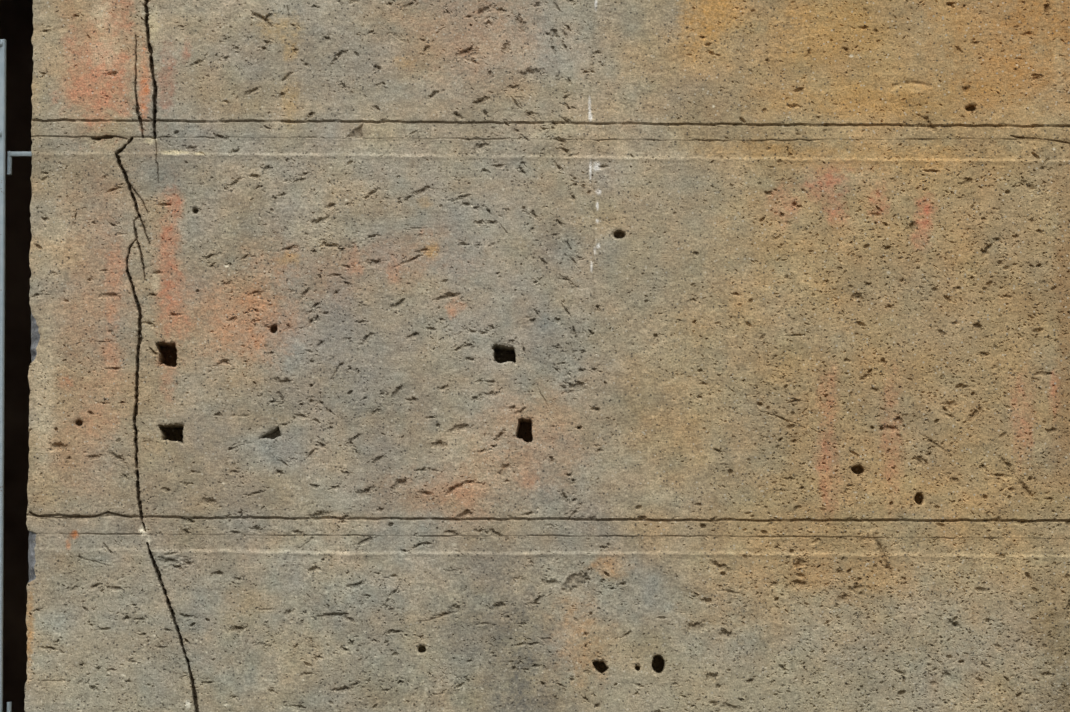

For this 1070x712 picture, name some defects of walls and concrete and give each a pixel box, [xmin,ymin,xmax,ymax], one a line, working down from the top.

crack [28,0,199,712]